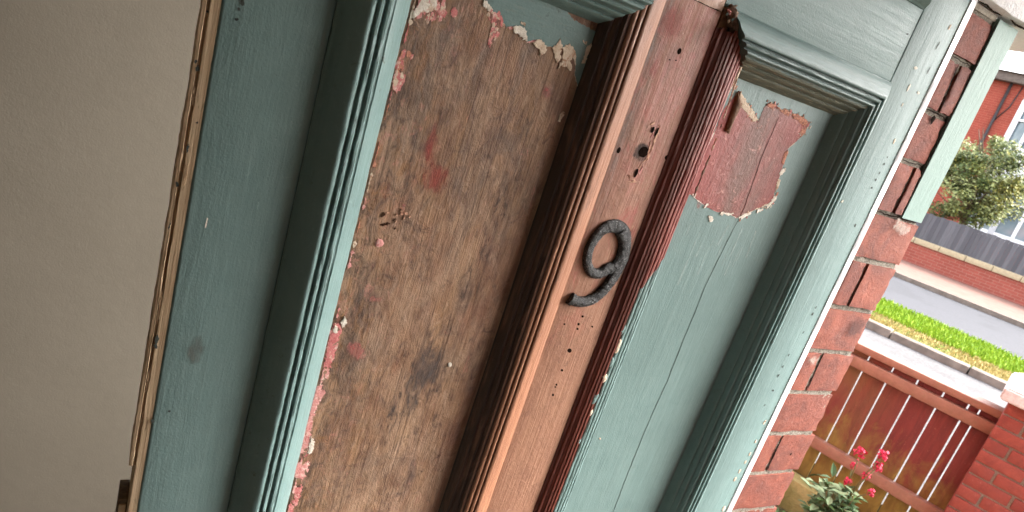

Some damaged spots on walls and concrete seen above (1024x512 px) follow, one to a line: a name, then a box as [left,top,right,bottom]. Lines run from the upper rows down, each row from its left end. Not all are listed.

peeling [384,0,458,120]
peeling [482,0,595,86]
peeling [347,142,380,269]
peeling [689,76,812,222]
peeling [287,308,347,512]